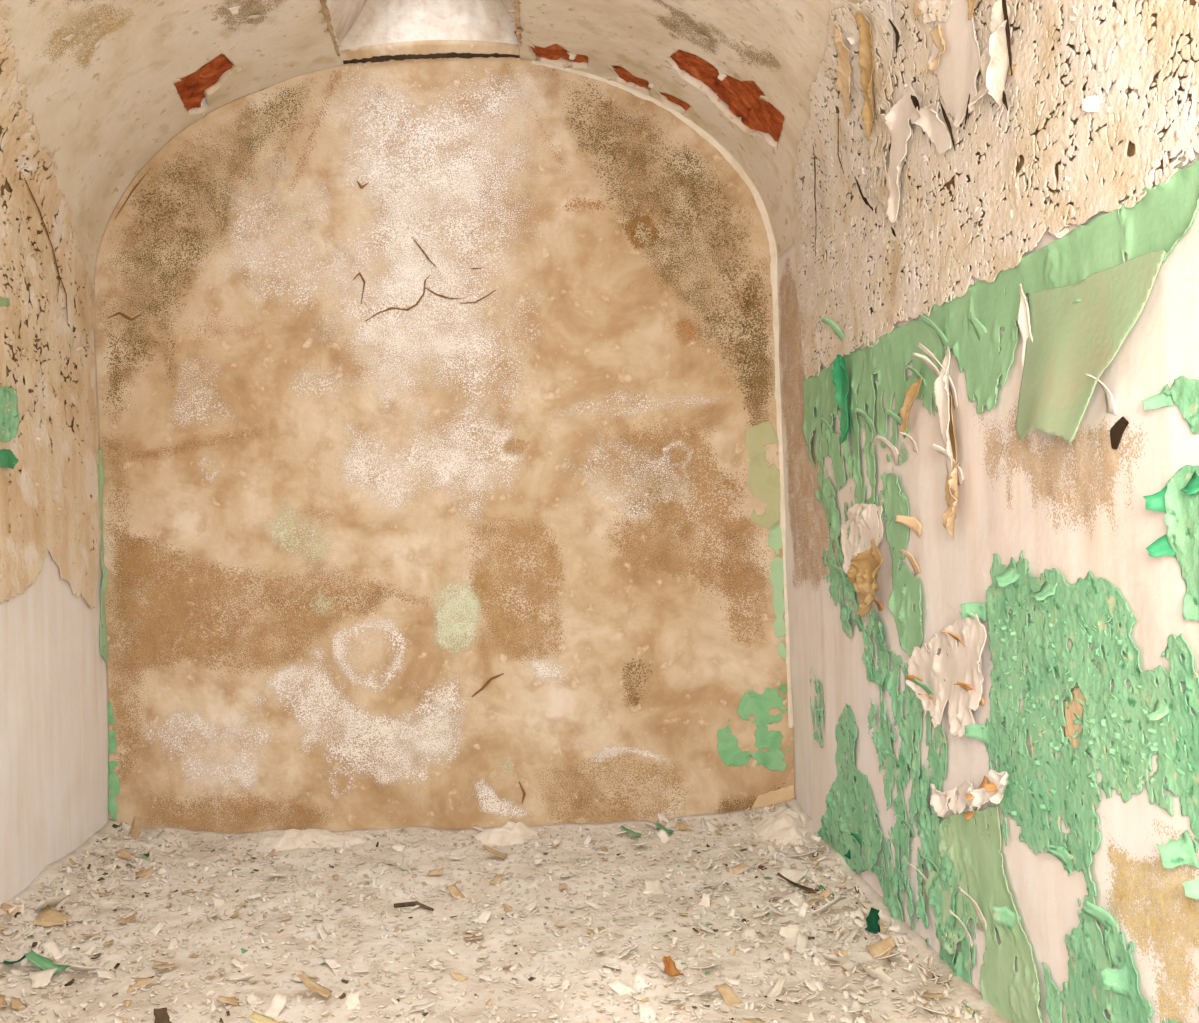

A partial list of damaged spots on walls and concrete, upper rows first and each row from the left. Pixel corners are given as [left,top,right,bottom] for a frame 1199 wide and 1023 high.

flaking render [0,3,109,663]
crack [352,237,496,321]
damp [97,59,775,833]
peeling [745,0,1199,1023]